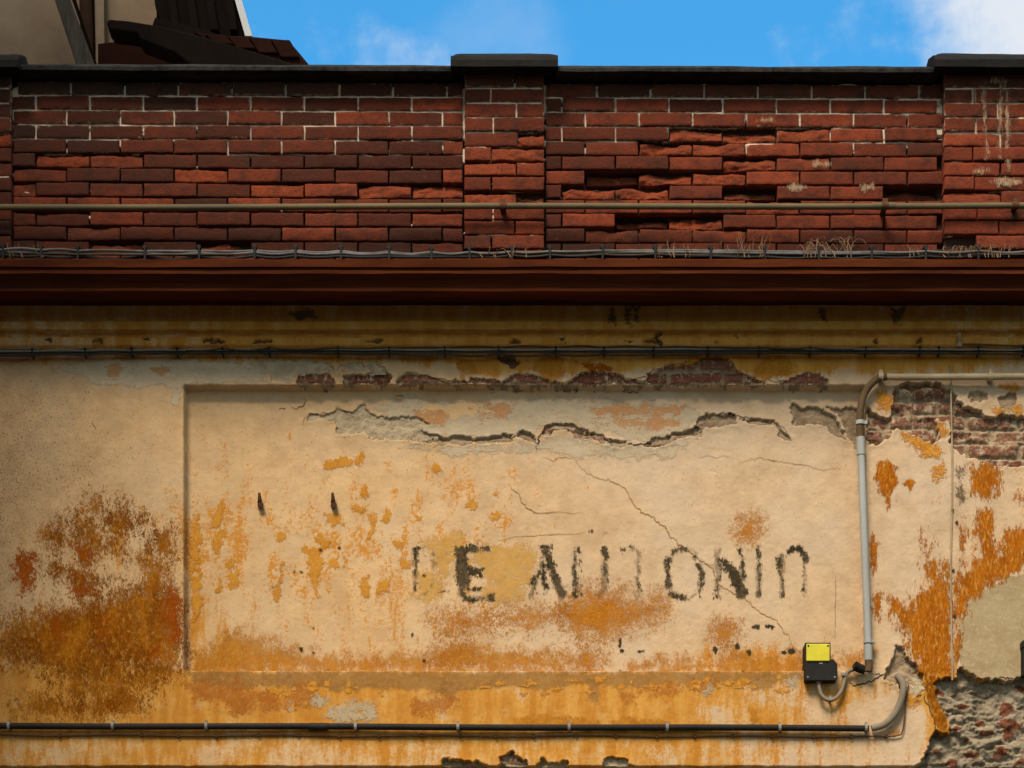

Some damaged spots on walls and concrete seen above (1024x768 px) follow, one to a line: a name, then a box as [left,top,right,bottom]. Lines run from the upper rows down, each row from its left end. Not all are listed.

damp [973,77,1022,187]
peeling [296,340,1024,473]
peeling [187,502,241,621]
peeling [271,484,392,602]
crack [497,412,838,655]
damp [955,466,967,504]
damp [180,670,804,717]
spalling [884,648,1024,768]